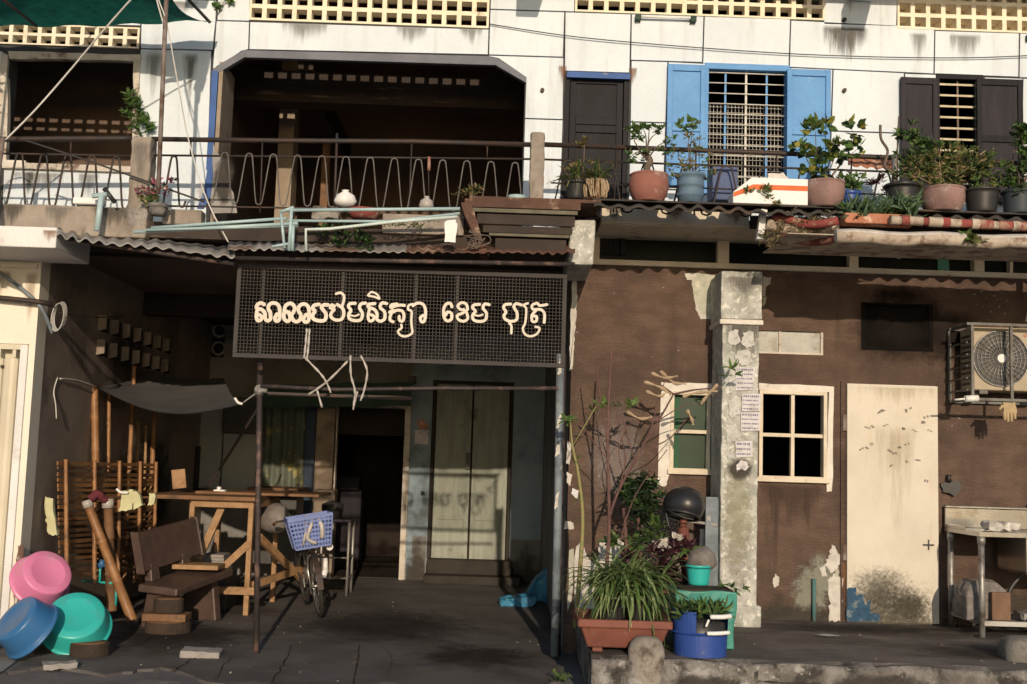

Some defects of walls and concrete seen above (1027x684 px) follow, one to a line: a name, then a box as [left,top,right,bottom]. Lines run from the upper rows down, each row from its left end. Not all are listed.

water stain [825,28,865,47]
peeling [819,545,844,622]
water stain [599,670,638,684]
water stain [678,668,726,684]
water stain [839,675,924,684]